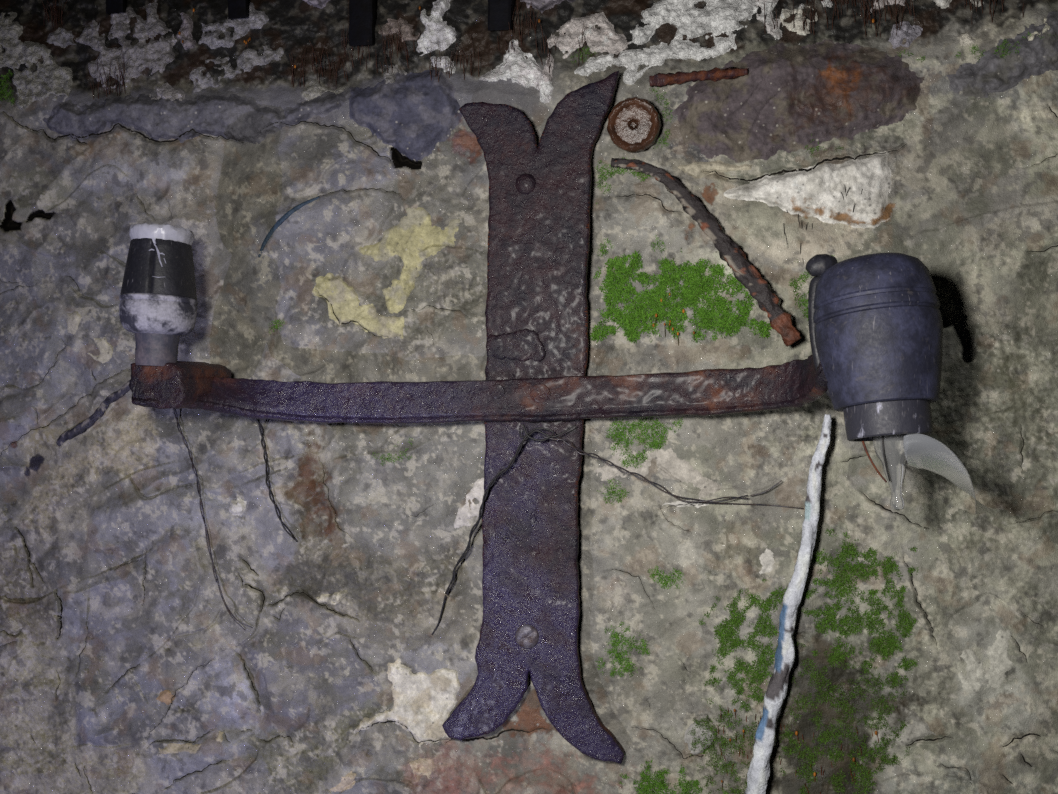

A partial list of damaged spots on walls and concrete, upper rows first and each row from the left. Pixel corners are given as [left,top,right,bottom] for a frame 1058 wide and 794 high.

crack [3,111,403,166]
corrosion [611,158,801,347]
corrosion [486,328,546,362]
crack [319,459,355,541]
crack [17,528,63,639]
crack [238,559,373,671]
crack [148,653,294,789]
crack [907,736,971,783]
crack [1002,733,1058,784]